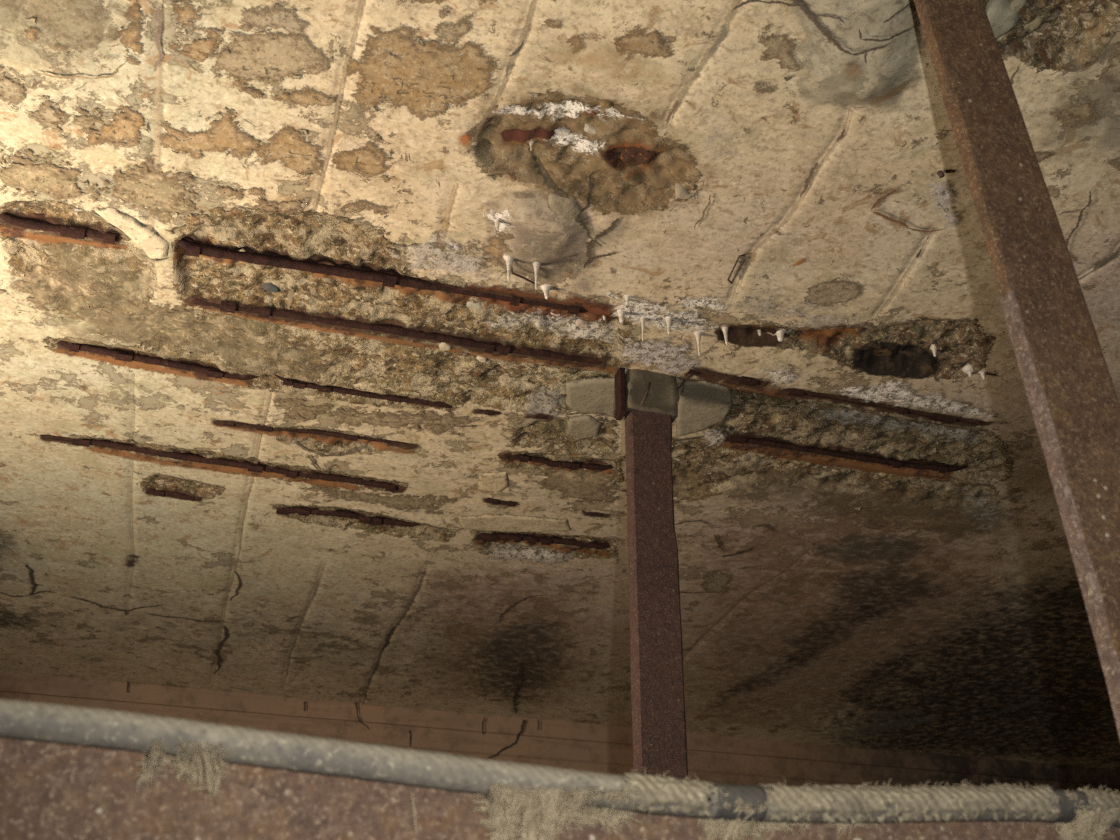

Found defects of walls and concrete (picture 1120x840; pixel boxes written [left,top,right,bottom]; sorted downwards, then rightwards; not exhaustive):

crack [731,0,918,63]
spalling [168,0,702,215]
water stain [483,210,588,274]
crack [1058,191,1092,245]
spalling [0,66,635,518]
corrosion [314,273,619,322]
corrosion [56,349,247,386]
water stain [488,292,861,376]
spalling [712,316,995,383]
corrosion [85,447,357,490]
spalling [38,434,619,560]
water stain [486,543,573,565]